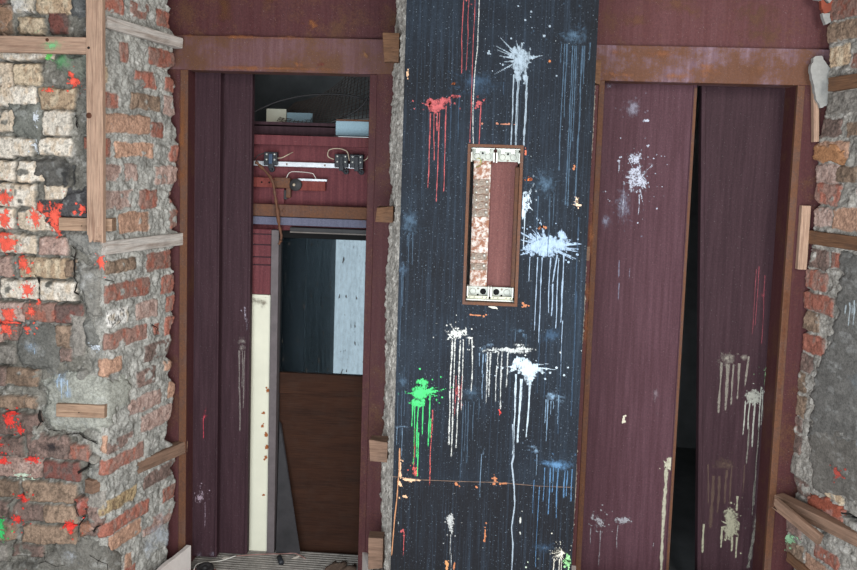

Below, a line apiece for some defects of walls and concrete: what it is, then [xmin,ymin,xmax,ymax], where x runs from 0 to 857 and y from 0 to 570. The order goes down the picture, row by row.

peeling [814,0,832,25]
peeling [808,56,831,108]
spalling [812,143,847,165]
spalling [808,493,847,518]